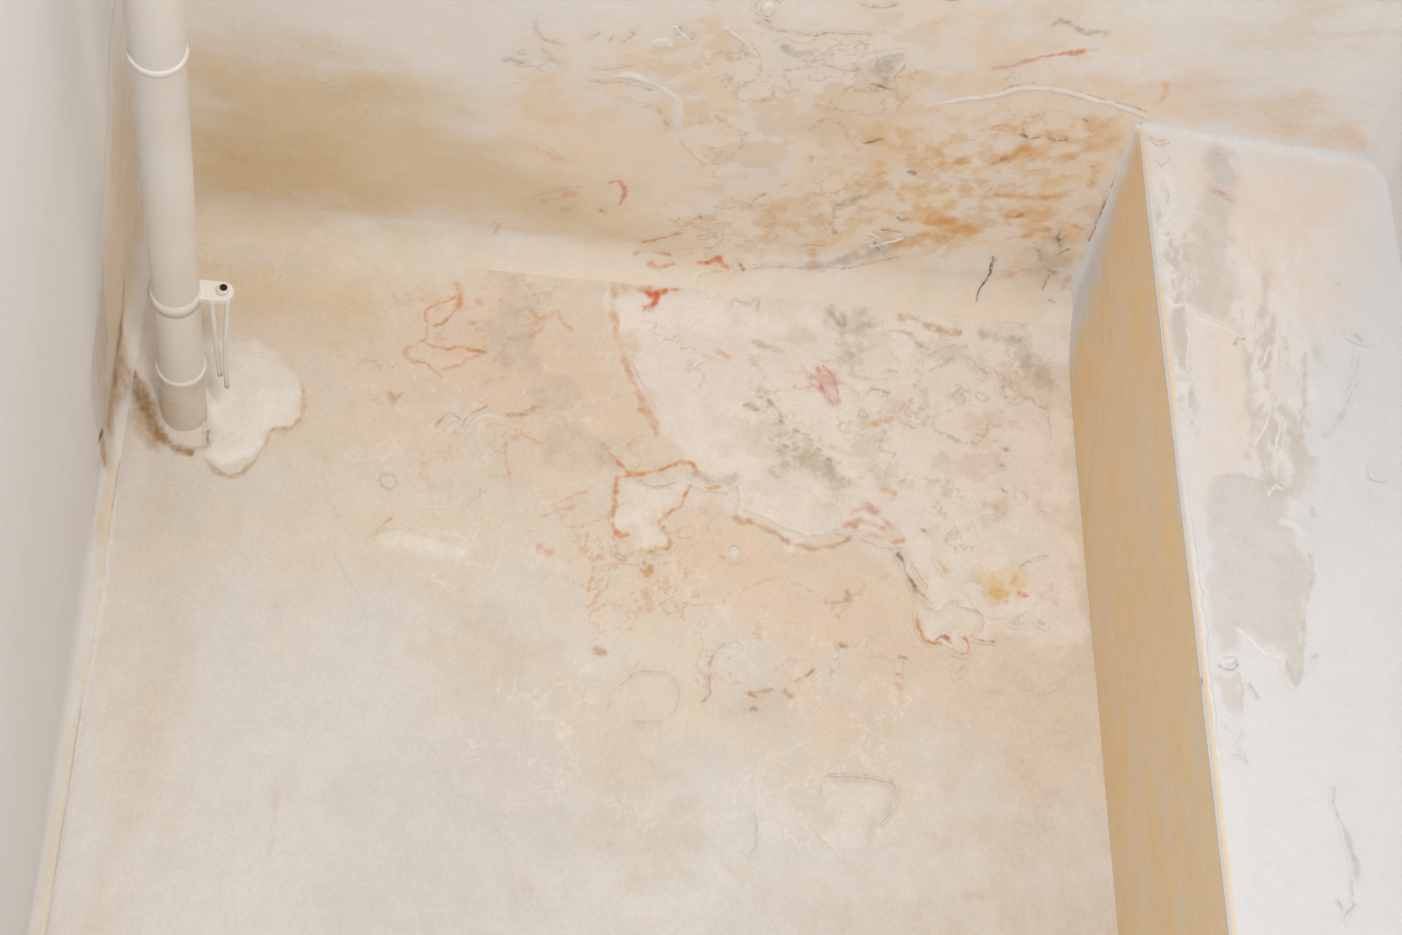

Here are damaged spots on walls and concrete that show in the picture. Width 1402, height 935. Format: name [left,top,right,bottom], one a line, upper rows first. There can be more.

damp [95,0,160,394]
damp [185,0,1402,315]
peeling [733,232,917,278]
peeling [1009,228,1086,305]
peeling [1190,134,1248,348]
damp [27,475,117,935]
damp [49,180,1118,935]
peeling [559,280,1095,696]
damp [1069,125,1400,935]
flaking render [1197,468,1324,692]